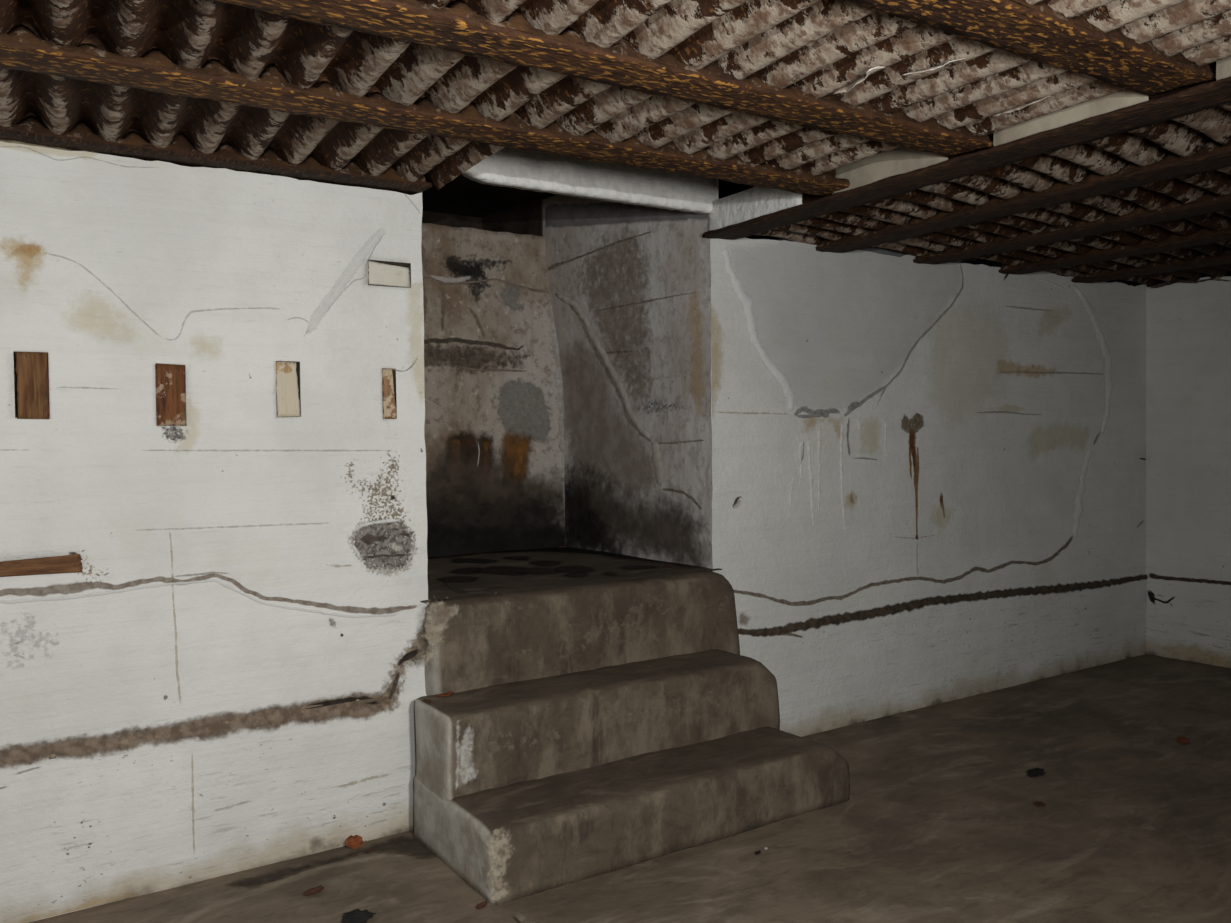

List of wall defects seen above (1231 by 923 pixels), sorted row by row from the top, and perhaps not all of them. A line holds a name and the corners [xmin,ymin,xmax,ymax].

water stain [12,246,39,266]
water stain [446,255,511,336]
water stain [426,450,702,582]
corrosion [901,413,924,540]
crack [0,572,416,618]
crack [733,536,1231,638]
crack [0,693,388,768]